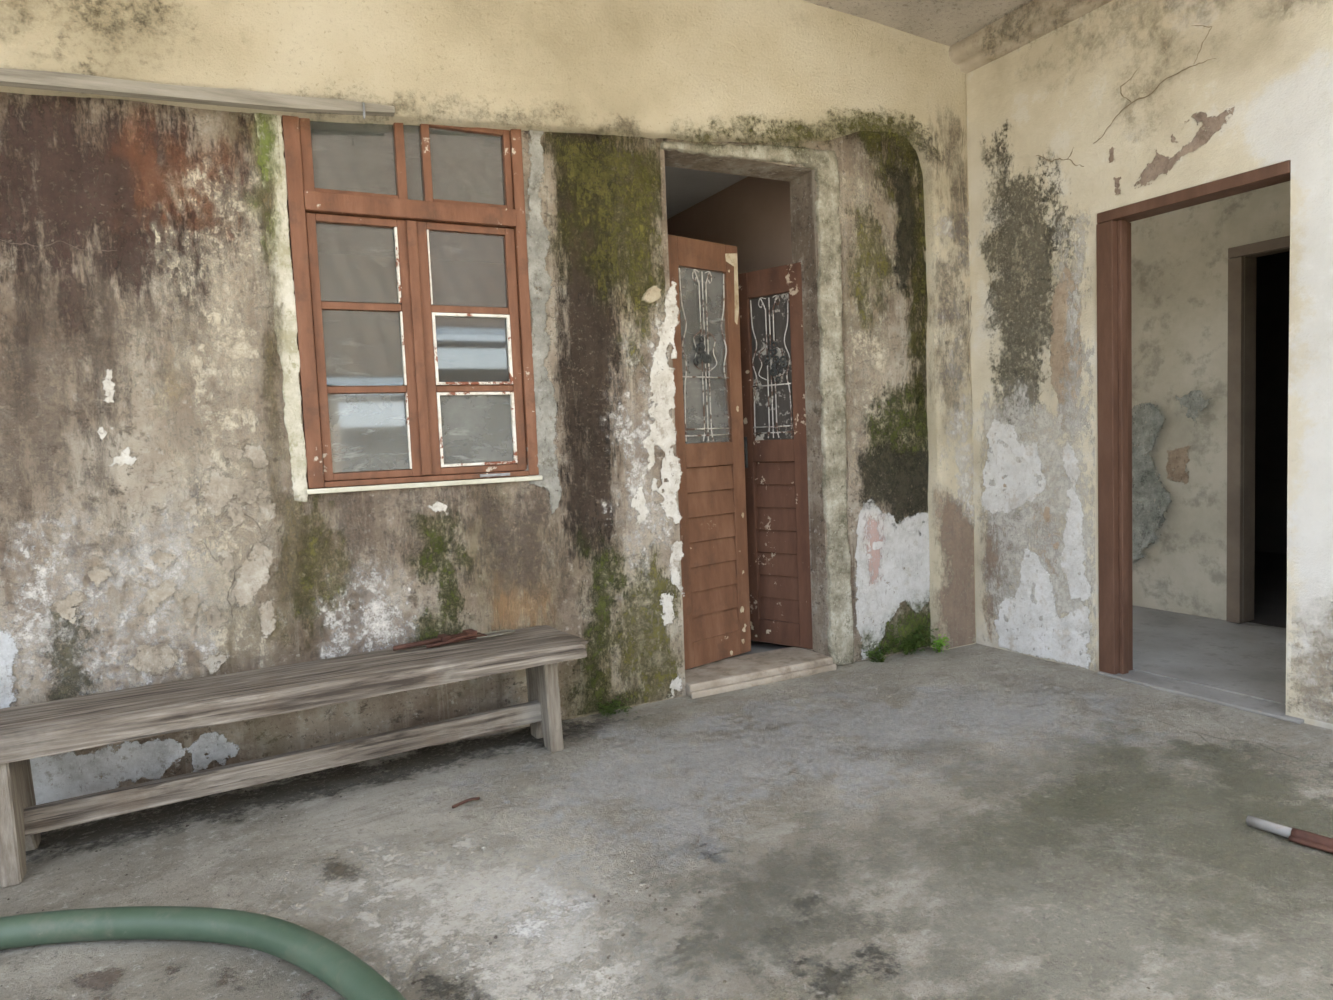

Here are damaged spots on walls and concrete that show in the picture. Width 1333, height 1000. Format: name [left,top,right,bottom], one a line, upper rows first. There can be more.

crack [1036,25,1216,167]
peeling [1109,108,1234,195]
damp [0,93,552,701]
damp [551,119,672,580]
peeling [631,281,683,525]
damp [674,108,1096,666]
peeling [980,263,1094,669]
peeling [1132,402,1191,563]
peeling [659,539,685,626]
flaking render [854,499,930,660]
flaking render [0,631,19,709]
peeling [666,674,683,699]